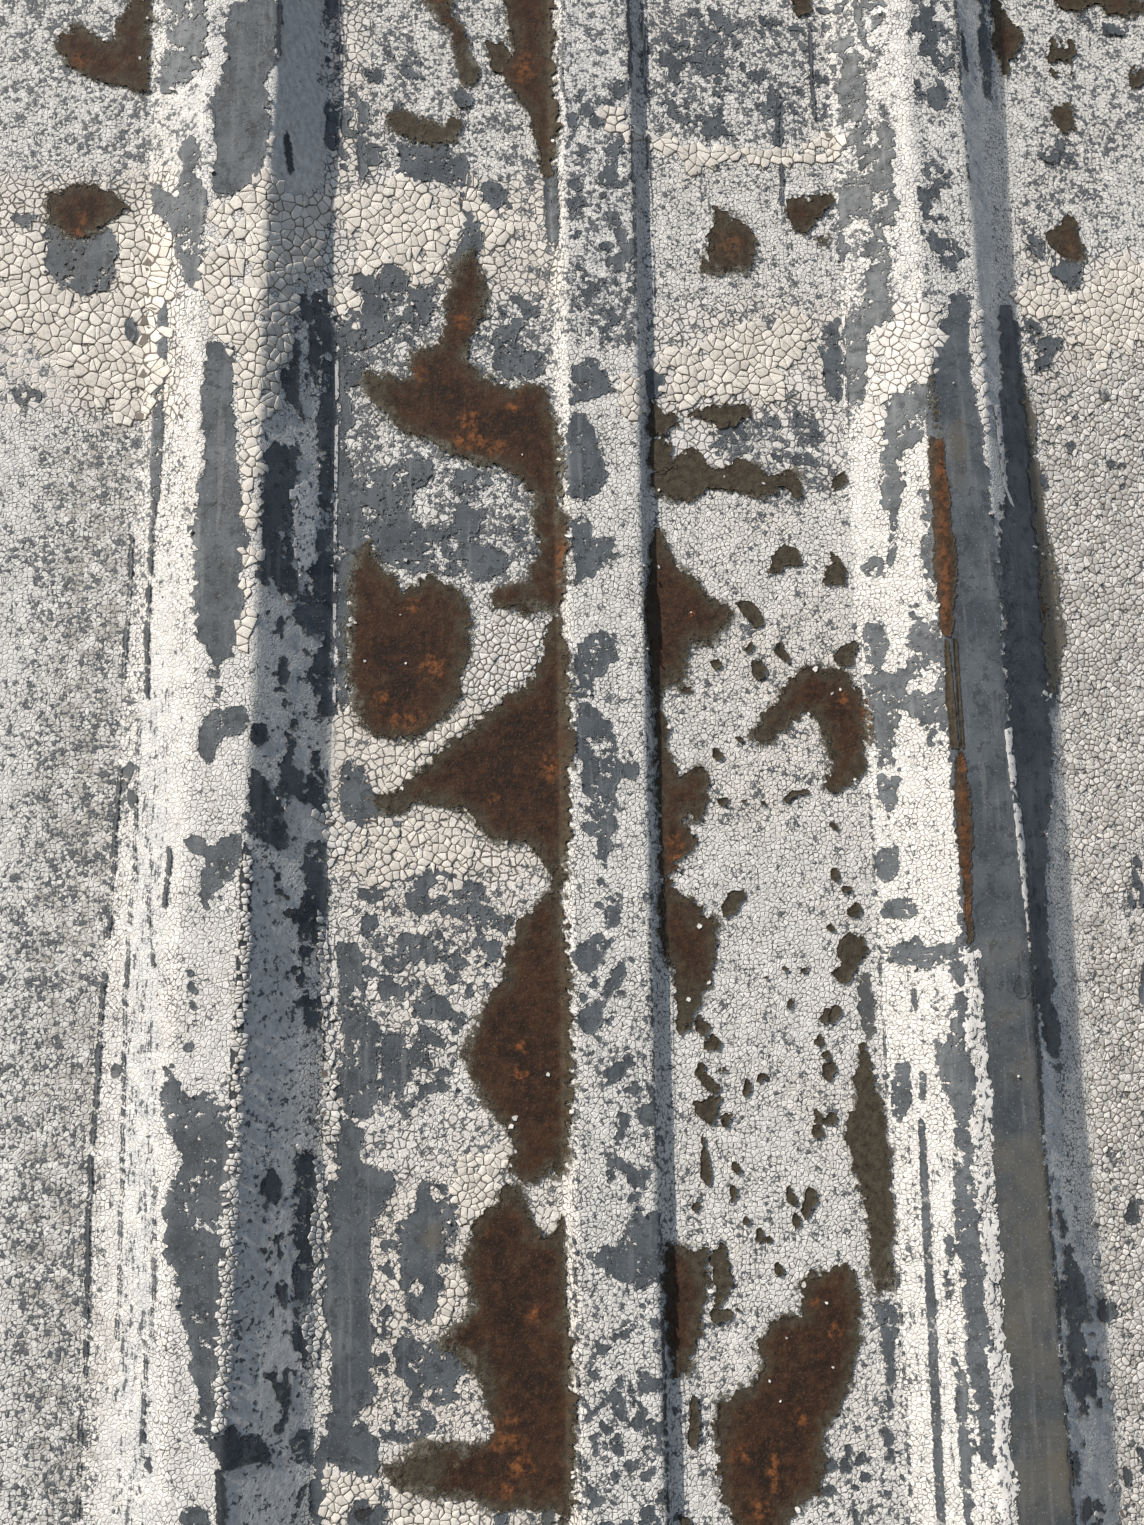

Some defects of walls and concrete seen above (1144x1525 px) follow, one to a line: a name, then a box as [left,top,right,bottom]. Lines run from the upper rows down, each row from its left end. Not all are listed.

crack [0,136,515,653]
peeling [159,41,531,1525]
rust [338,248,583,1525]
rust [383,0,563,187]
peeling [569,624,667,1525]
rust [641,527,874,1186]
rust [658,1005,901,1525]
peeling [658,0,969,428]
peeling [823,1298,905,1525]
crack [609,253,1144,1525]
rust [927,359,974,944]
peeling [856,293,1119,1525]